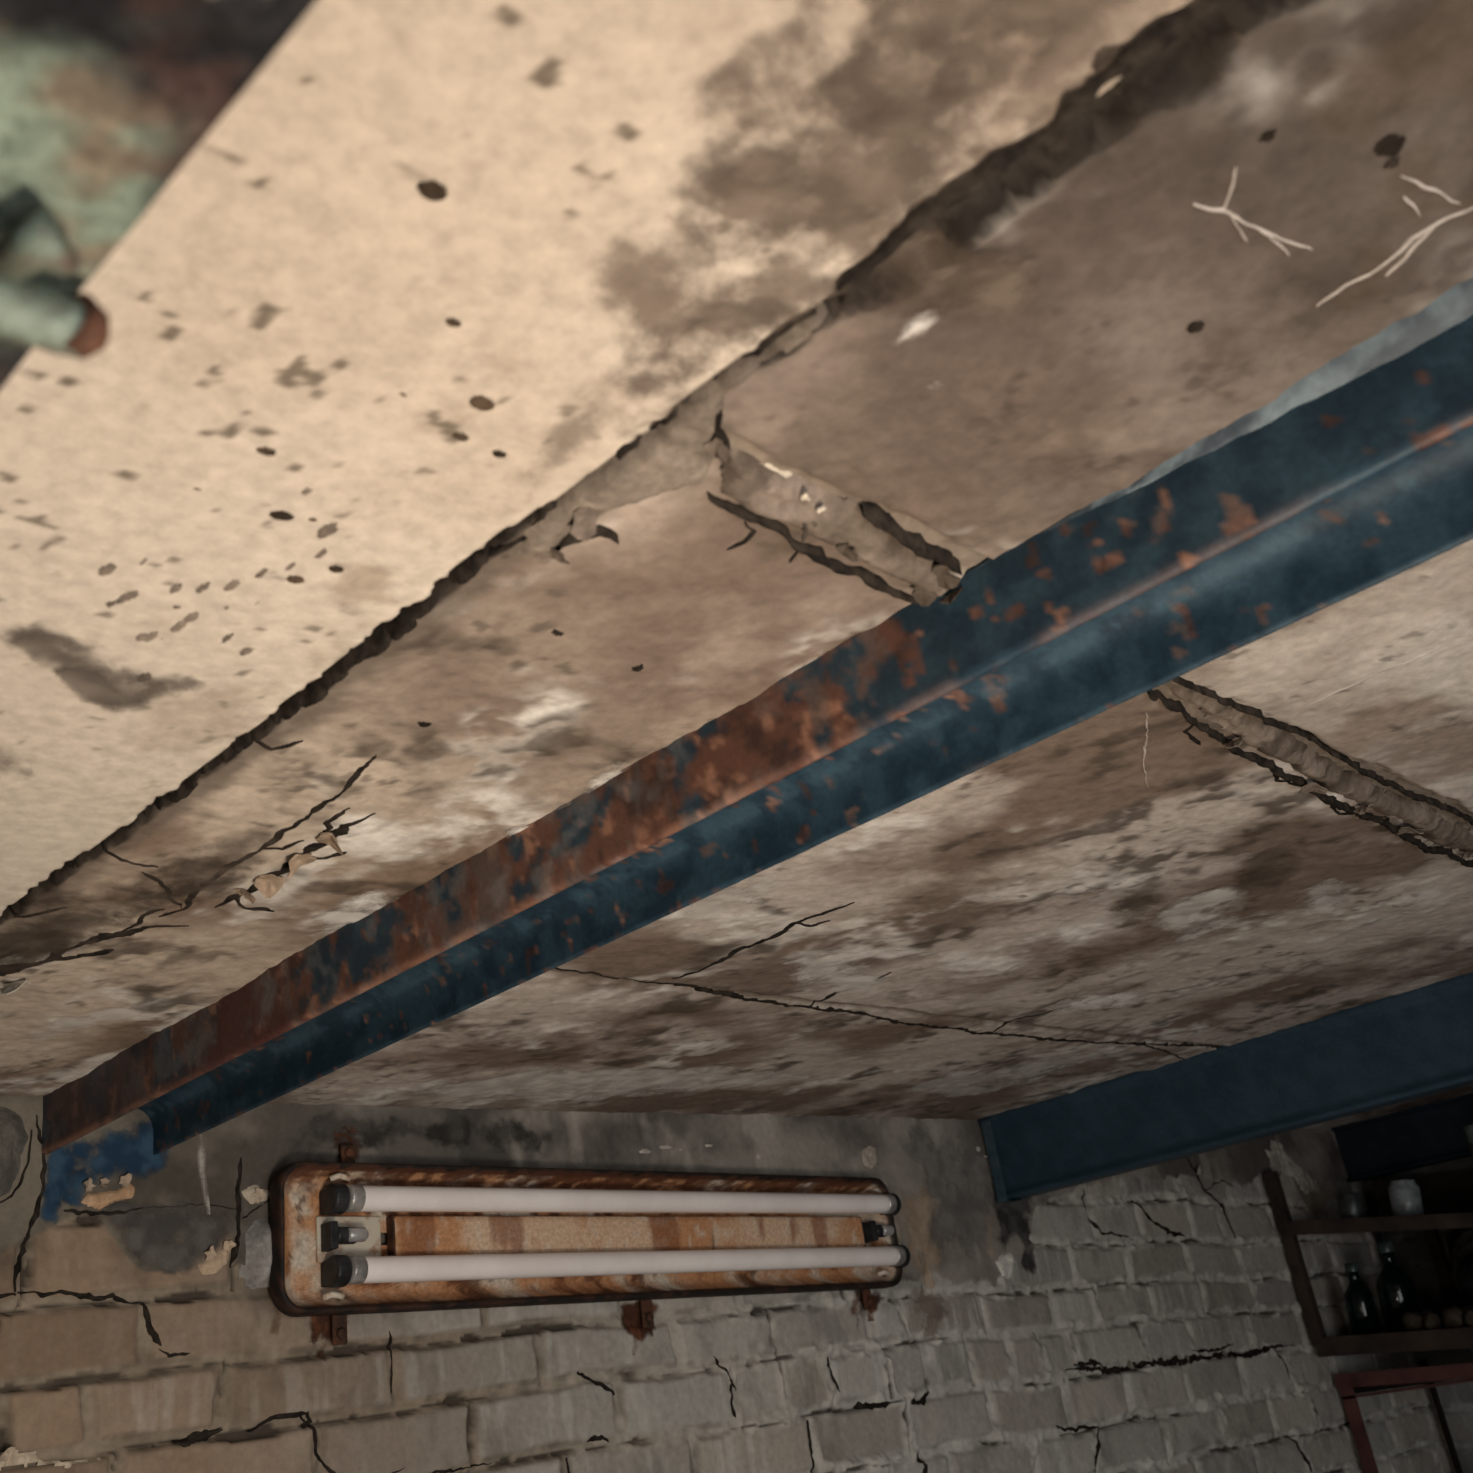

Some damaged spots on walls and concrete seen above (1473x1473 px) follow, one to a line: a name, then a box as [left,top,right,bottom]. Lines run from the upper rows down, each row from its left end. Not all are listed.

damp [682,0,1131,311]
damp [606,244,845,395]
crack [707,492,920,605]
crack [858,501,962,576]
damp [56,668,201,711]
crack [0,306,817,976]
crack [1147,677,1473,868]
damp [315,892,384,934]
crack [554,902,1219,1060]
flaking render [64,1173,142,1216]
rust [621,1301,657,1341]
rust [852,1290,881,1322]